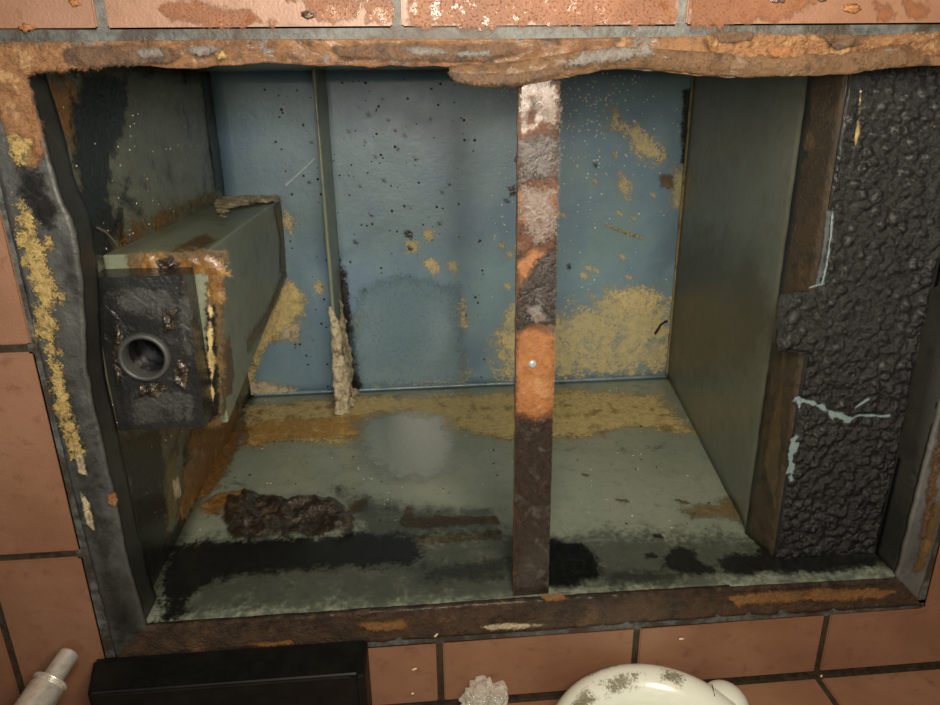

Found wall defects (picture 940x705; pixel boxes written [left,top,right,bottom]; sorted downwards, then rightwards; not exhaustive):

corrosion [705,31,940,59]
corrosion [519,82,563,130]
water stain [518,133,561,184]
corrosion [517,183,559,286]
corrosion [516,304,555,419]
water stain [235,242,696,596]
peeling [75,444,86,475]
water stain [119,429,501,623]
water stain [675,499,741,522]
water stain [645,546,882,576]
corrosion [729,587,898,608]
corrosion [482,622,540,630]